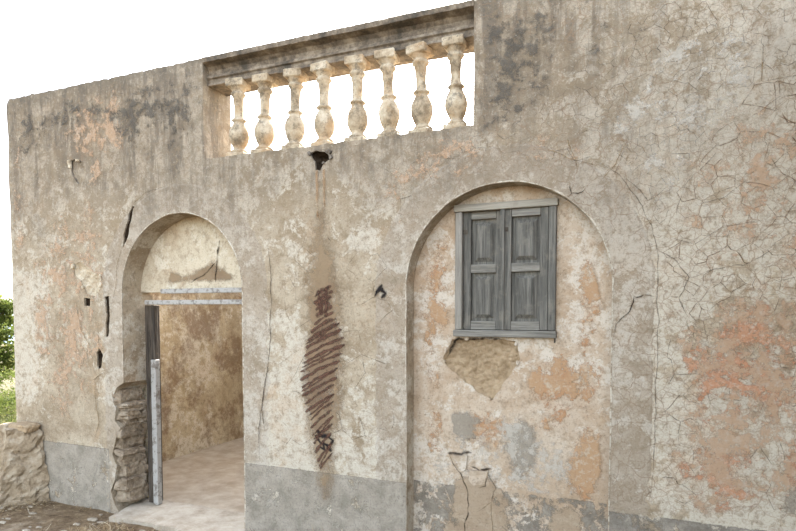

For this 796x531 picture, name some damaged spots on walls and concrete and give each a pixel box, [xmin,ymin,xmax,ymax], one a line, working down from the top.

damp [15,83,191,183]
damp [34,208,103,417]
spalling [71,262,103,297]
crack [535,0,796,509]
spalling [442,337,520,401]
crack [448,451,495,531]